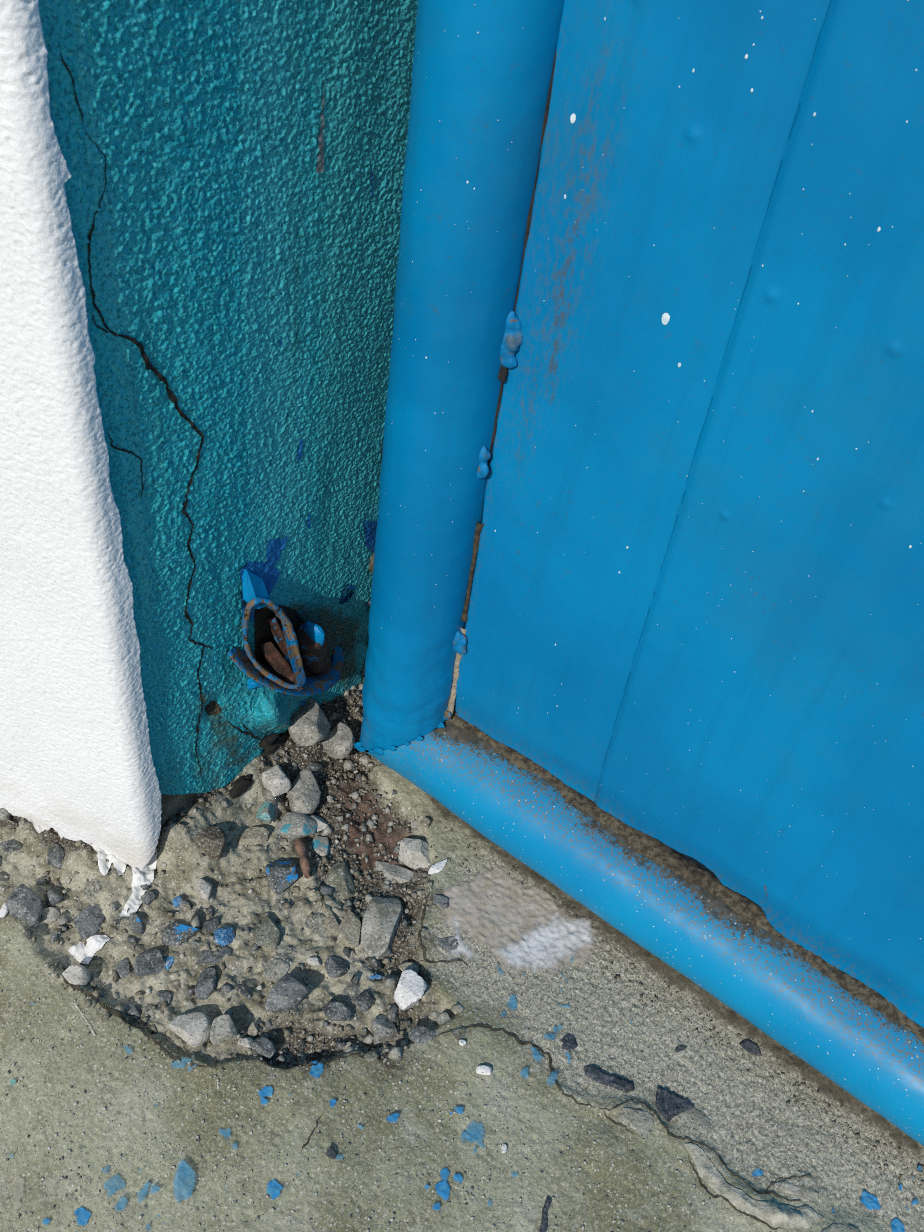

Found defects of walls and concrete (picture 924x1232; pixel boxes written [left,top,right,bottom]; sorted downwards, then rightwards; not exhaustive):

crack [60,49,260,787]
spalling [205,701,222,716]
spalling [259,733,288,756]
spalling [228,774,253,799]
crack [435,1023,815,1230]